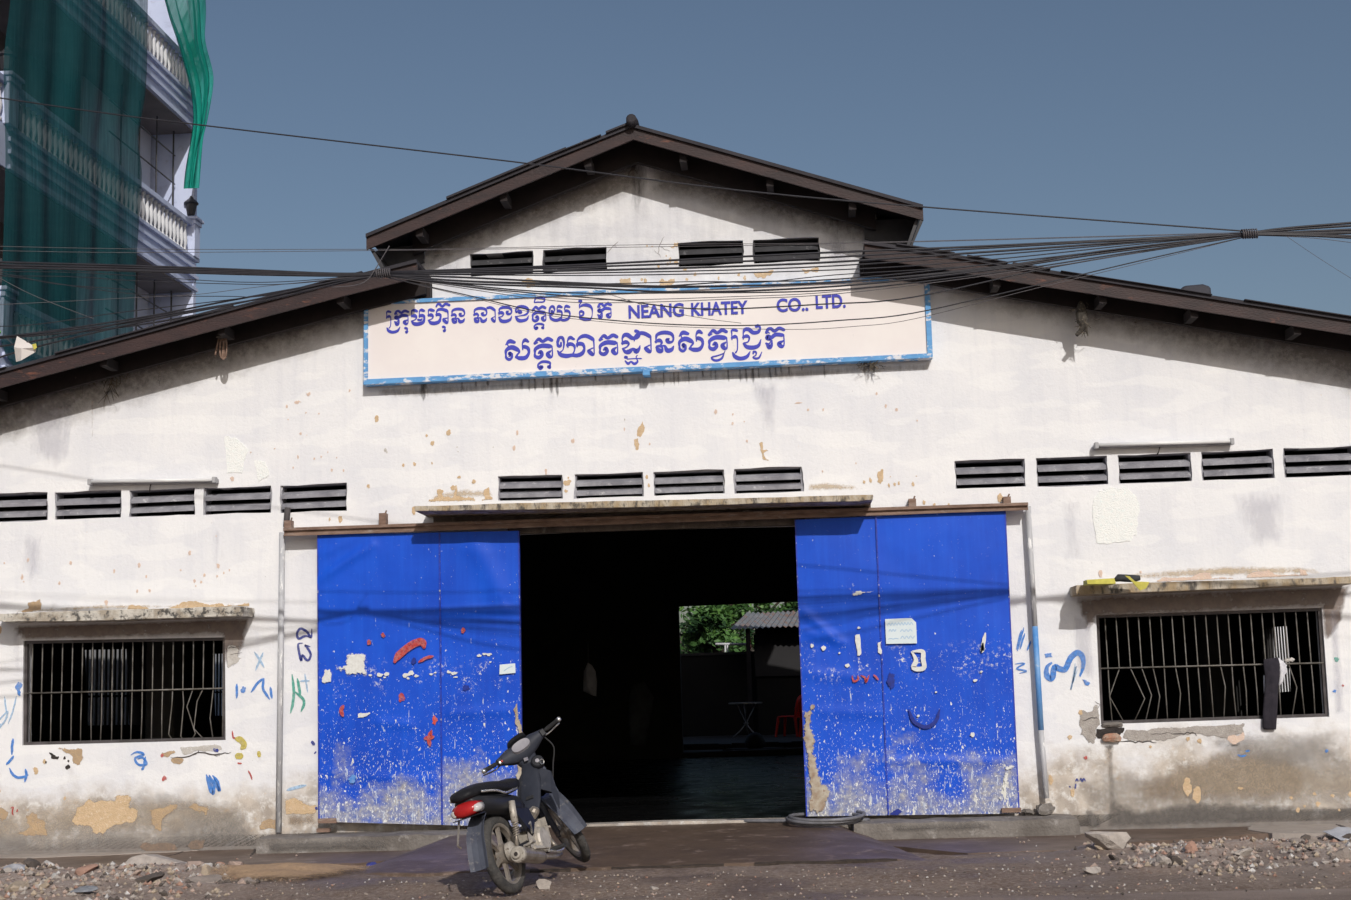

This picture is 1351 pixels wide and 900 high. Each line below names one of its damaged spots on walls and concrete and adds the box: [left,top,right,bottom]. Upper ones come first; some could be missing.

peeling [429,476,492,502]
peeling [1068,705,1245,748]
peeling [33,748,83,774]
peeling [1183,777,1201,803]
leakage [1088,747,1347,827]
peeling [63,795,208,851]